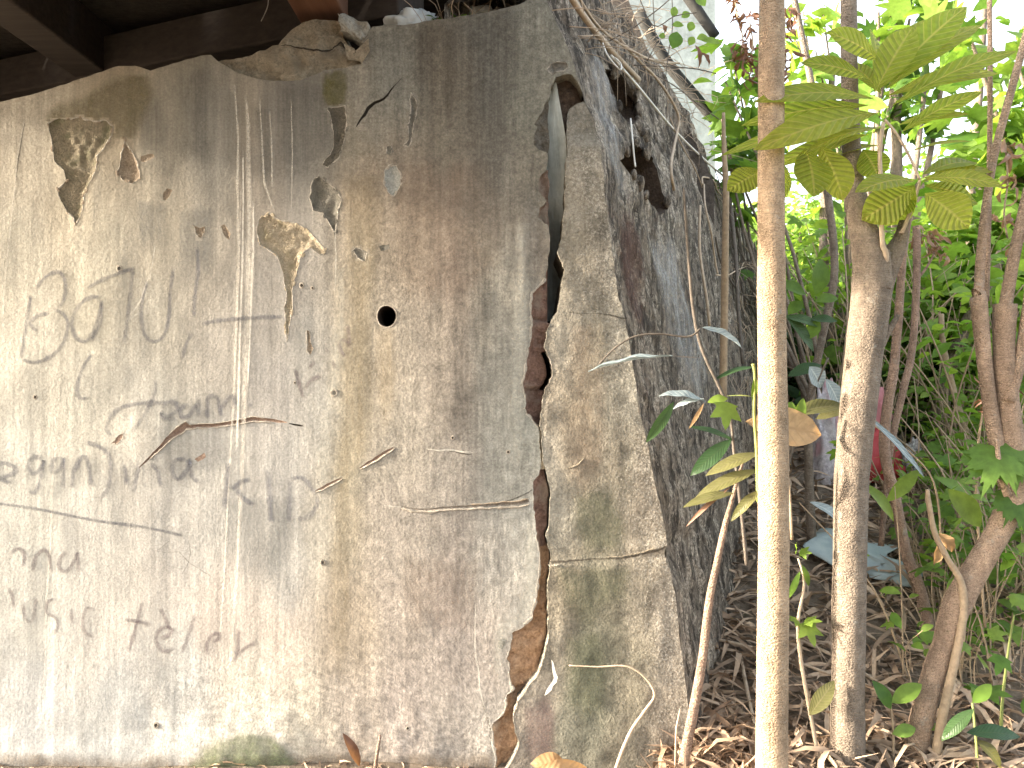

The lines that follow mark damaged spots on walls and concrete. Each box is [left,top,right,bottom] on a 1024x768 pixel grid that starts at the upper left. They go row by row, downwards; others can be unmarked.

spalling [47,116,154,226]
spalling [309,105,349,235]
crack [356,79,401,127]
spalling [605,60,671,215]
peeling [257,212,327,340]
crack [139,416,303,468]
crack [384,81,666,767]